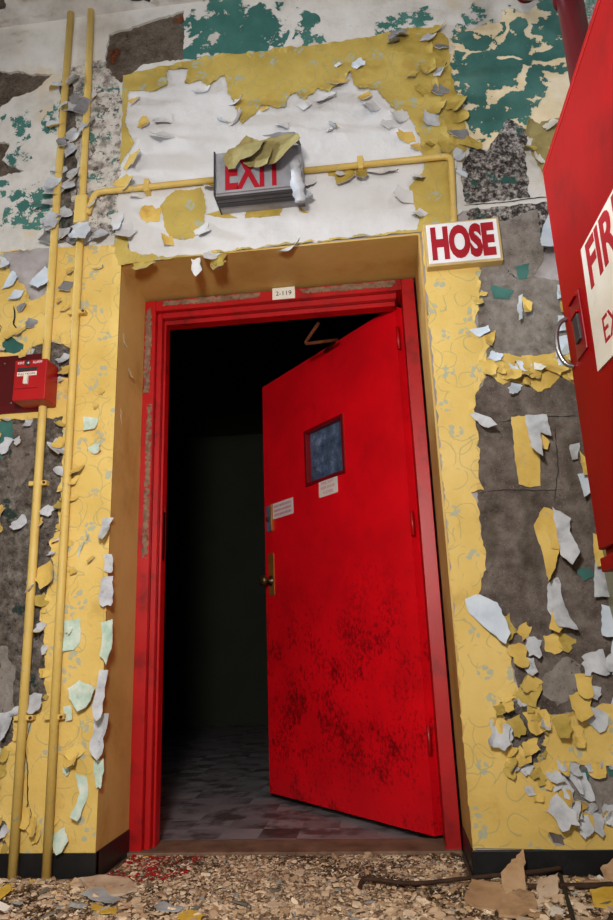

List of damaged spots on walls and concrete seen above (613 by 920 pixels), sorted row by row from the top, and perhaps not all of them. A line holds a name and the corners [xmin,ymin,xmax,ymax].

peeling [584,0,597,25]
peeling [295,57,366,110]
peeling [0,0,327,393]
peeling [330,166,399,184]
peeling [470,284,573,394]
peeling [83,387,104,430]
peeling [470,412,497,428]
peeling [569,443,590,497]
peeling [0,417,114,787]
peeling [465,533,613,839]
peeling [62,619,113,821]
peeling [53,814,68,855]